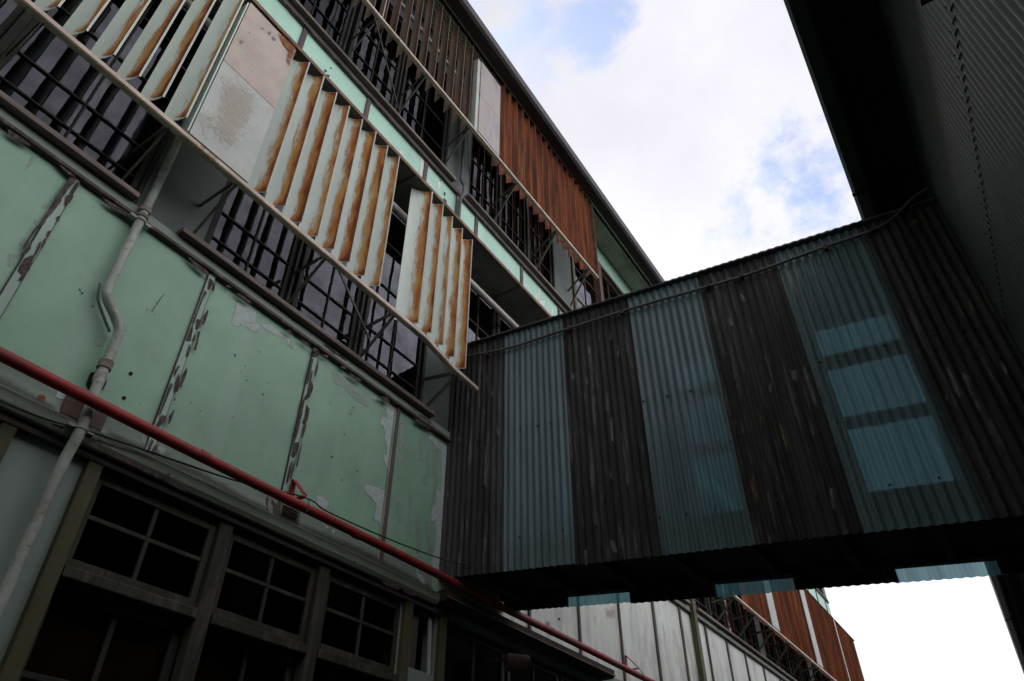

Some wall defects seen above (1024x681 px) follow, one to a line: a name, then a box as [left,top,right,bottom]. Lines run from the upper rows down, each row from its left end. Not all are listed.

corrosion [103,0,150,55]
corrosion [126,0,184,77]
corrosion [150,0,214,98]
corrosion [176,0,244,118]
corrosion [254,28,400,285]
peeling [9,176,80,281]
peeling [157,278,216,426]
peeling [232,302,290,345]
corrosion [407,191,473,368]
peeling [286,351,320,483]
peeling [371,396,403,468]
peeling [364,484,385,534]